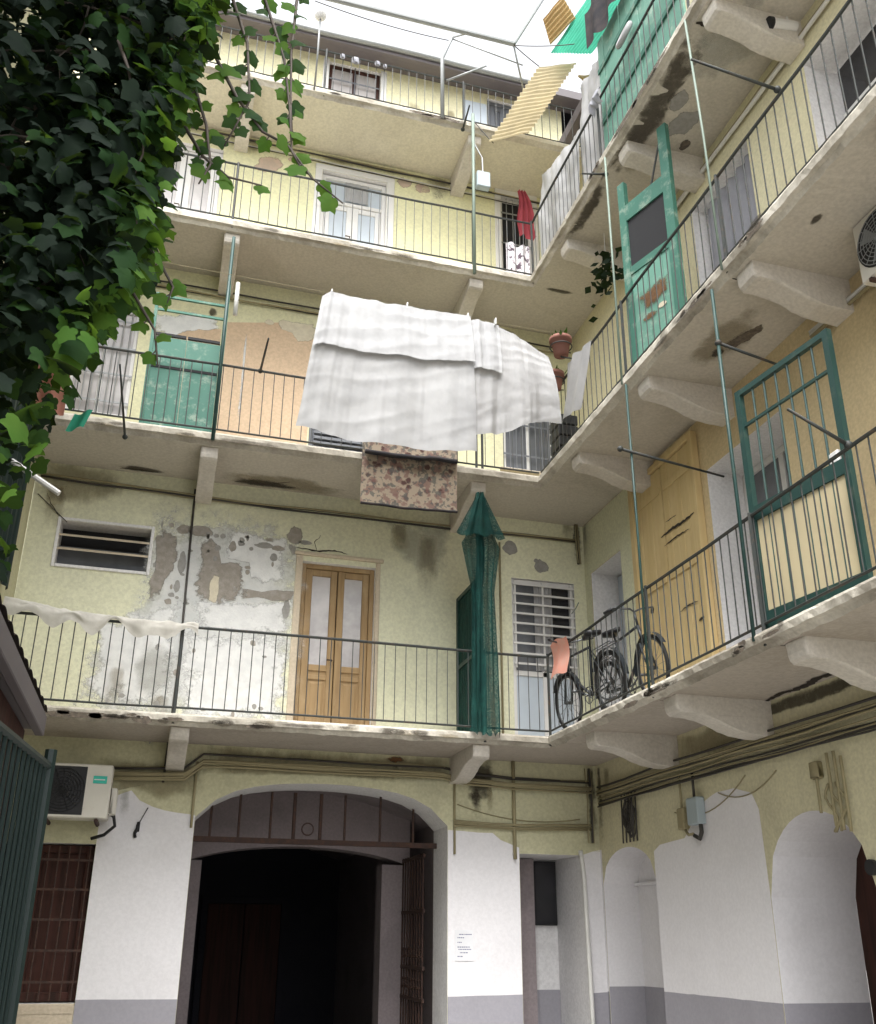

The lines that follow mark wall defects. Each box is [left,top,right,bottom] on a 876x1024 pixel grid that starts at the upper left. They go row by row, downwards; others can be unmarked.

damp [613,42,691,164]
damp [570,179,602,234]
peeling [155,308,218,346]
peeling [265,320,315,342]
damp [712,325,762,357]
crack [297,535,346,554]
peeling [45,518,322,729]
damp [766,673,851,715]
damp [470,766,492,806]